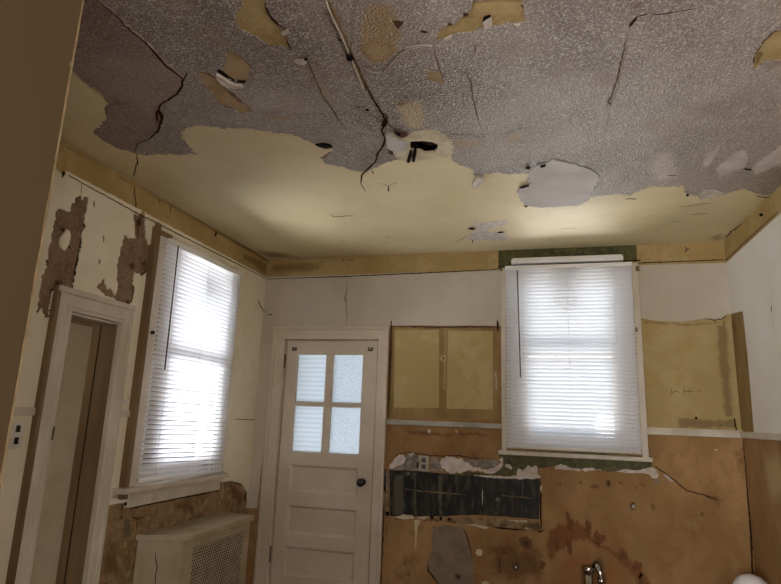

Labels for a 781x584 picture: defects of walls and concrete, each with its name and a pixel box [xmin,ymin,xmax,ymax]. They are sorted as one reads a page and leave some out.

peeling [236,0,291,48]
peeling [435,0,525,41]
crack [607,7,701,105]
peeling [754,30,781,69]
crack [97,0,217,207]
crack [302,37,481,192]
flaking render [386,133,408,155]
spalling [0,0,84,489]
spalling [226,481,247,508]
flaking render [383,453,541,537]
crack [655,465,725,502]
water stain [478,520,634,584]